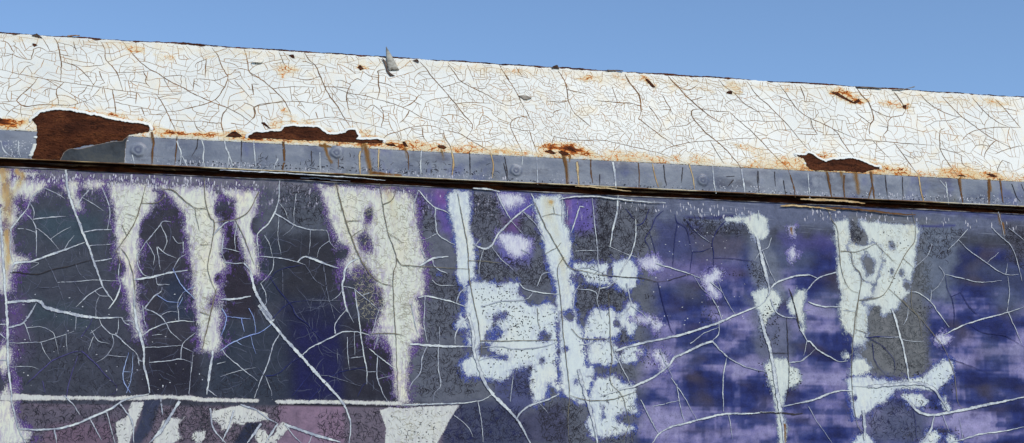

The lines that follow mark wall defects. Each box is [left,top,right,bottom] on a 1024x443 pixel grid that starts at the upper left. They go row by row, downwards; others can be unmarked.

rust [69,107,709,178]
crack [0,34,1024,205]
spalling [561,185,666,203]
rust [736,144,1024,200]
peeling [845,238,886,287]
crack [0,170,1024,443]
peeling [580,334,620,370]